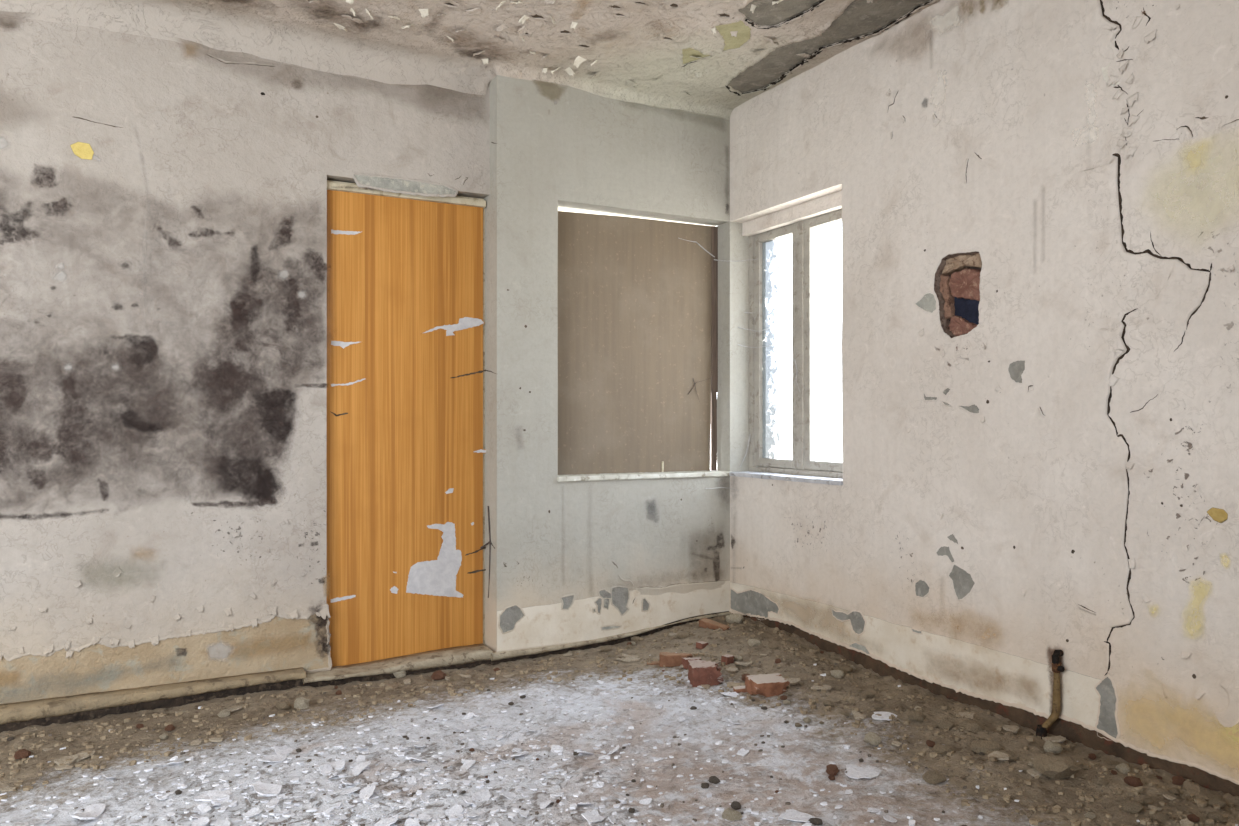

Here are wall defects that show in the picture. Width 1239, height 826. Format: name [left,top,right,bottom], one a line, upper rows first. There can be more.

crack [726,0,932,96]
crack [884,88,937,139]
water stain [0,206,28,242]
water stain [279,220,292,245]
water stain [0,336,174,488]
water stain [194,248,327,506]
spalling [914,247,998,362]
crack [1028,385,1045,420]
crack [1055,0,1239,676]
peeling [936,532,977,602]
peeling [0,593,332,704]
flaking render [725,588,1239,796]